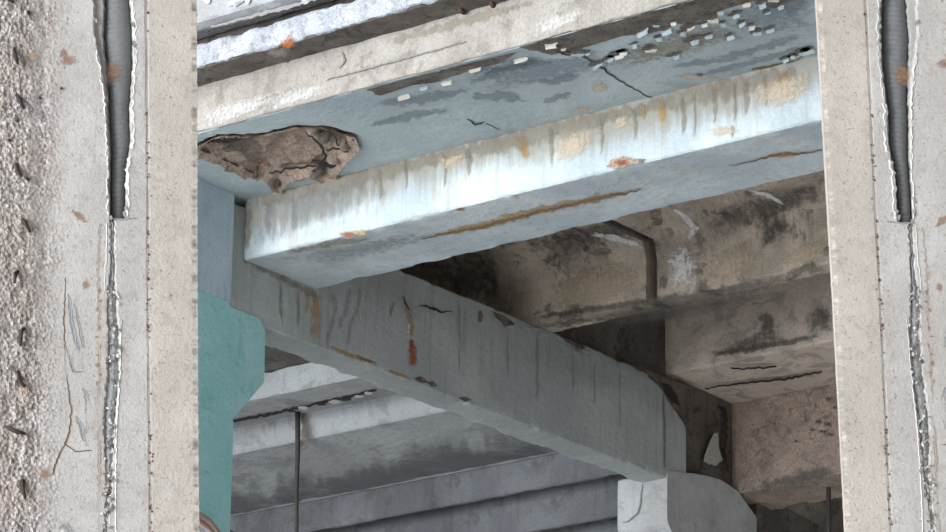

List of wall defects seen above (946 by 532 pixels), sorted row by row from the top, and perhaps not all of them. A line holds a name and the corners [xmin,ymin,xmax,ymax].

spalling [207,0,316,32]
spalling [197,125,361,194]
damp [262,0,805,205]
peeling [368,0,790,101]
crack [145,0,154,532]
damp [534,209,823,328]
crack [863,0,892,526]
crack [52,220,122,532]
corrosion [332,347,375,364]
corrosion [405,307,417,365]
damp [719,310,829,355]
crack [907,224,946,532]